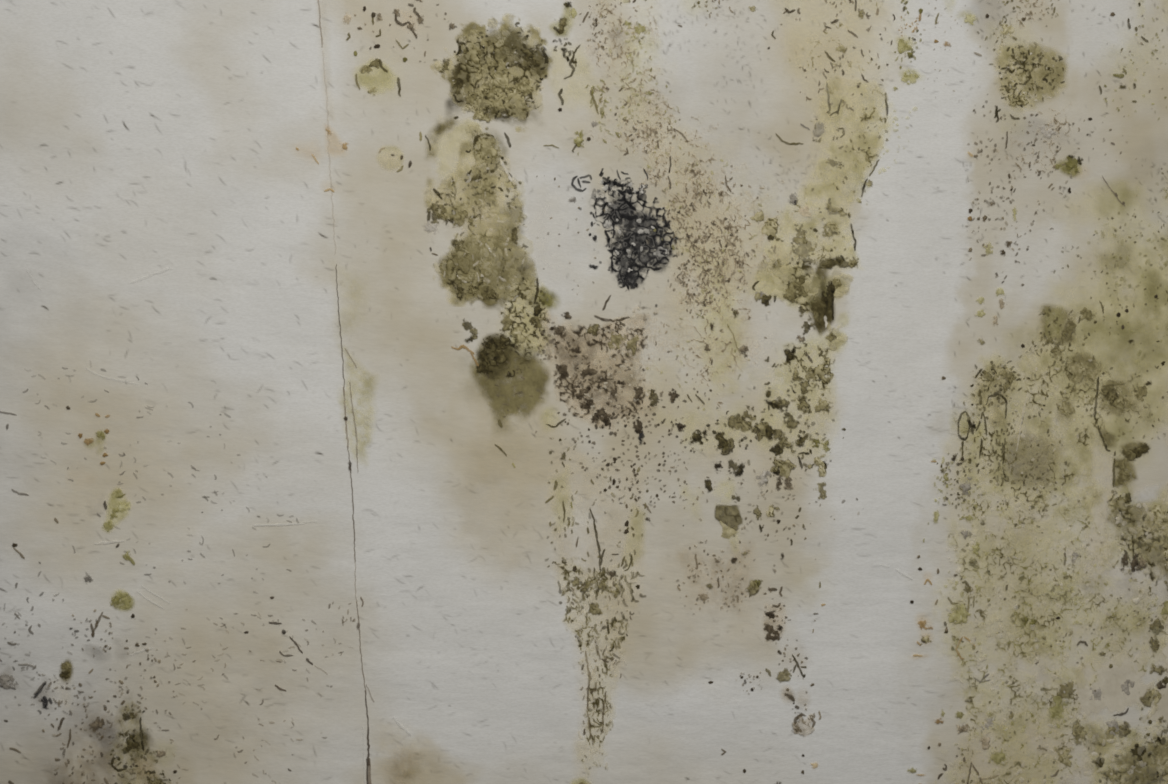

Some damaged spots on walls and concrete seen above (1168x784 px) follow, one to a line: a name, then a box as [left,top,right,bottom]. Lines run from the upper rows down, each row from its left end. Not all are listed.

water stain [344,0,423,96]
mould [894,0,923,90]
mould [965,0,1092,256]
crack [336,270,370,561]
water stain [420,0,857,761]
water stain [931,237,1168,784]
water stain [0,591,177,784]
crack [356,598,371,784]